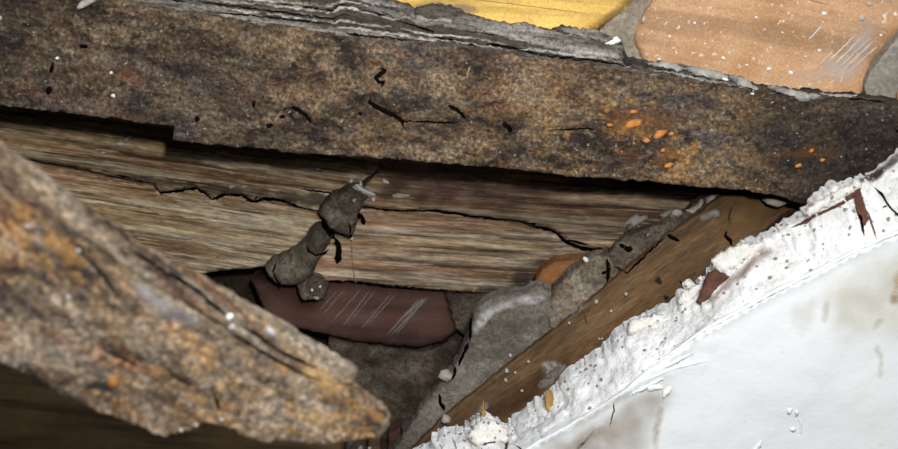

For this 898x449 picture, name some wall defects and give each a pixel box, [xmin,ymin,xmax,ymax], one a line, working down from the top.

peeling [76,0,96,10]
crack [283,106,311,123]
crack [368,68,466,130]
crack [547,125,596,133]
rust [607,110,642,129]
rust [642,130,680,168]
crack [875,188,898,216]
crack [117,175,679,292]
crack [72,244,120,301]
crack [125,246,336,384]
spalling [413,148,898,449]
crack [438,318,473,410]